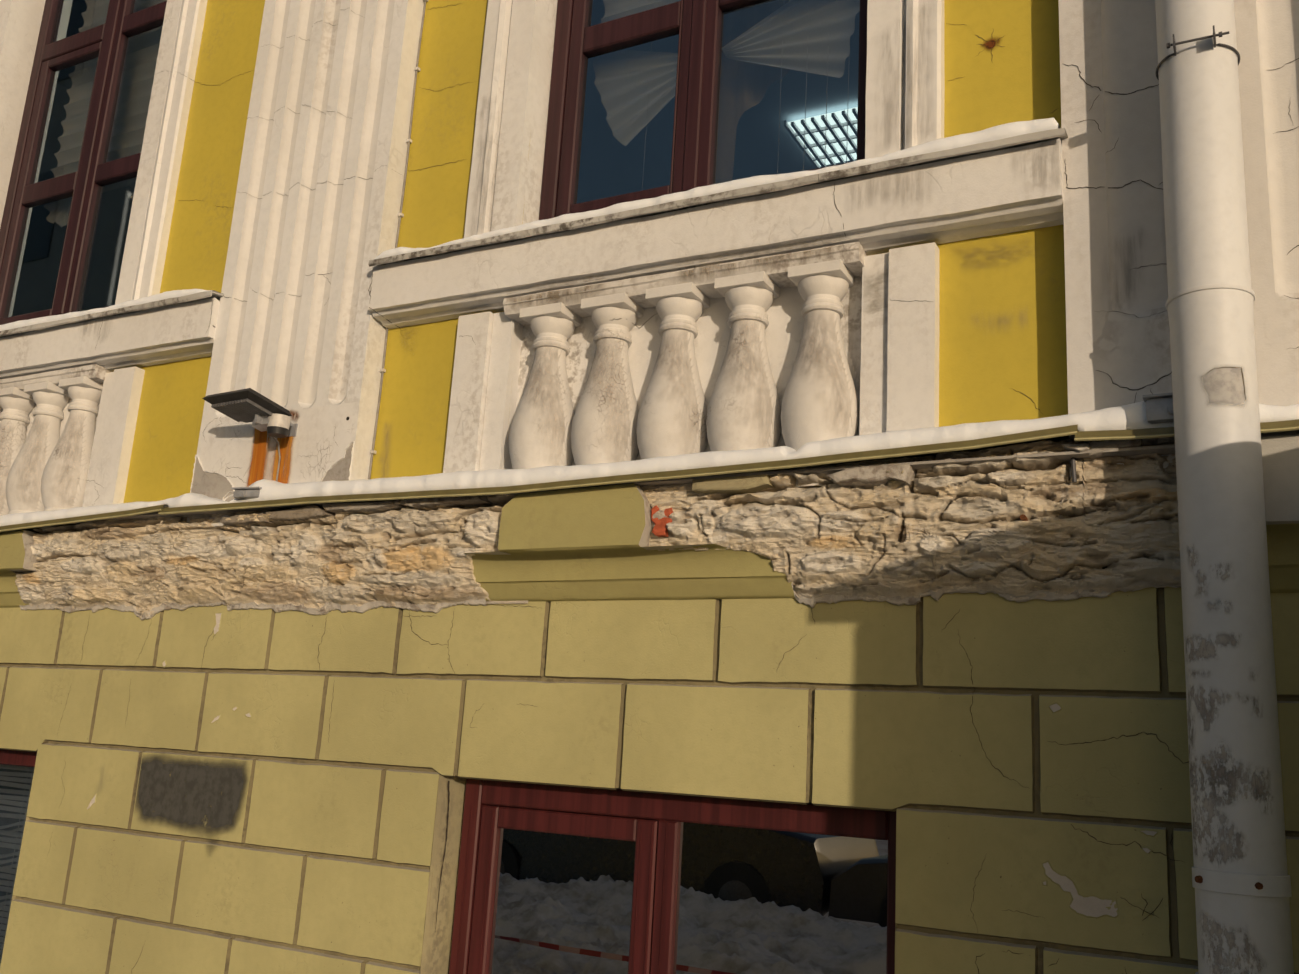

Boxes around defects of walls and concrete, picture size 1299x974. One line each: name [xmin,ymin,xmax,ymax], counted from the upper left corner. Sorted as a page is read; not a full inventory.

crack [1052,63,1159,153]
crack [1064,161,1163,189]
crack [1096,370,1172,403]
flaking render [190,455,235,502]
flaking render [321,441,355,482]
flaking render [19,599,487,635]
crack [942,609,1030,789]
crack [1049,732,1189,764]
peeling [1187,635,1267,863]
peeling [1041,860,1119,919]
peeling [1203,915,1261,974]